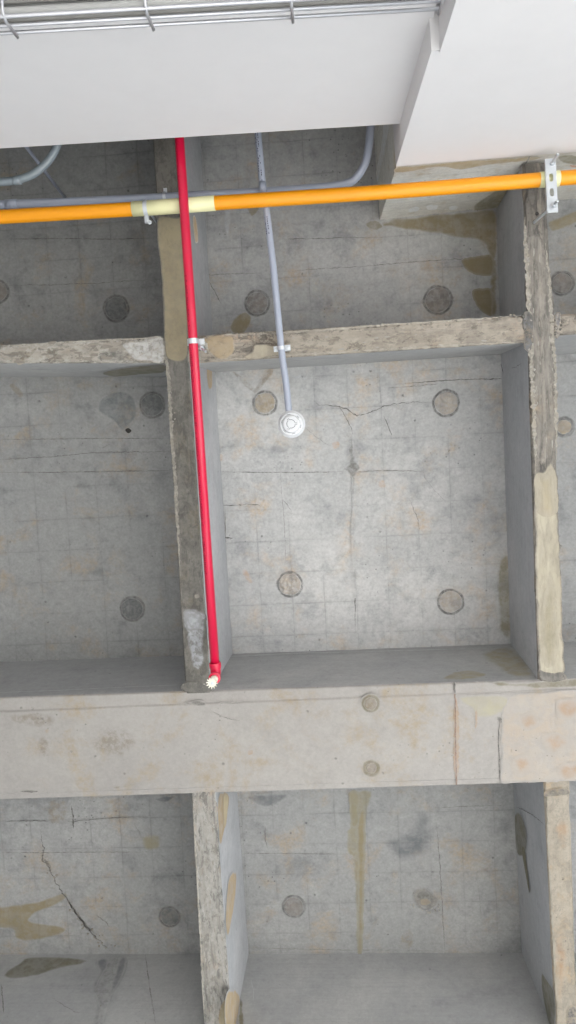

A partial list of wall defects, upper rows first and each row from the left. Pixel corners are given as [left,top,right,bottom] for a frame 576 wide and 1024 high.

leakage [365,190,507,317]
crack [223,365,519,612]
leakage [534,468,558,517]
leakage [540,576,559,668]
leakage [0,892,68,942]
crack [7,805,141,948]
leakage [345,789,373,954]
leakage [514,811,530,893]
leakage [3,956,89,979]
leakage [219,989,245,1024]